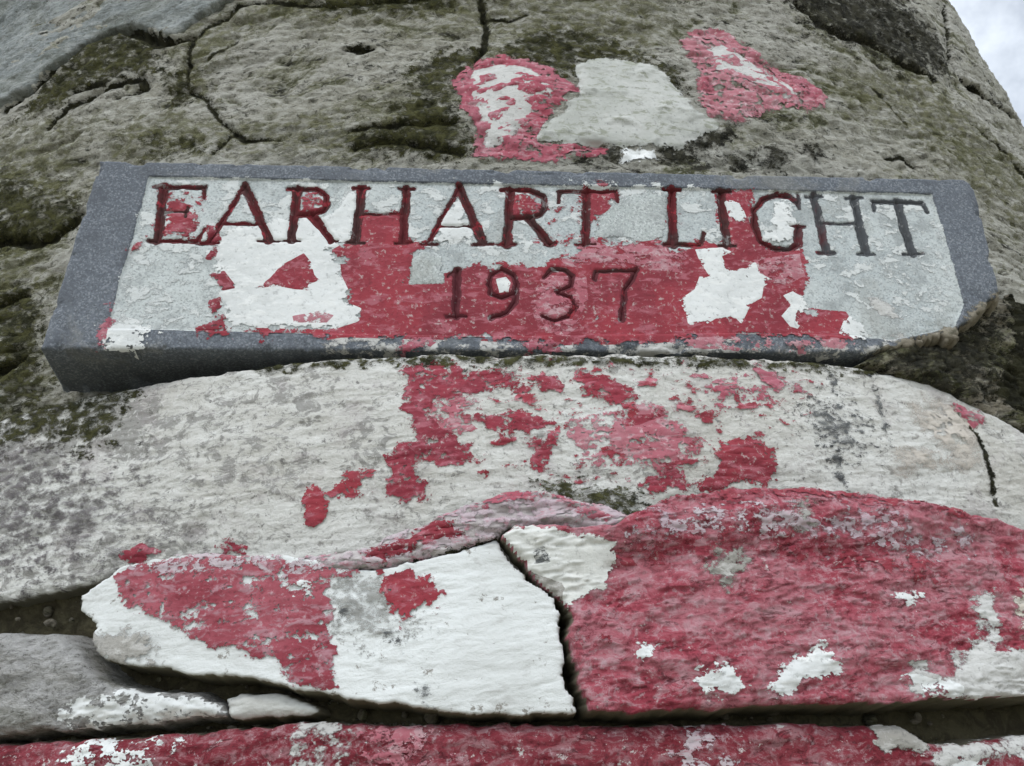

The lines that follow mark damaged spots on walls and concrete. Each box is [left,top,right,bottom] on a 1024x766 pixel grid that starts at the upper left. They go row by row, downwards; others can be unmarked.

crack [4,70,57,114]
crack [46,77,151,131]
crack [127,0,380,155]
spalling [452,28,828,164]
peeling [87,175,1024,612]
crack [951,402,999,507]
peeling [113,537,360,691]
peeling [376,568,446,630]
peeling [767,639,843,699]
spalling [899,587,1024,700]
peeling [55,687,228,766]
peeling [868,724,1024,766]